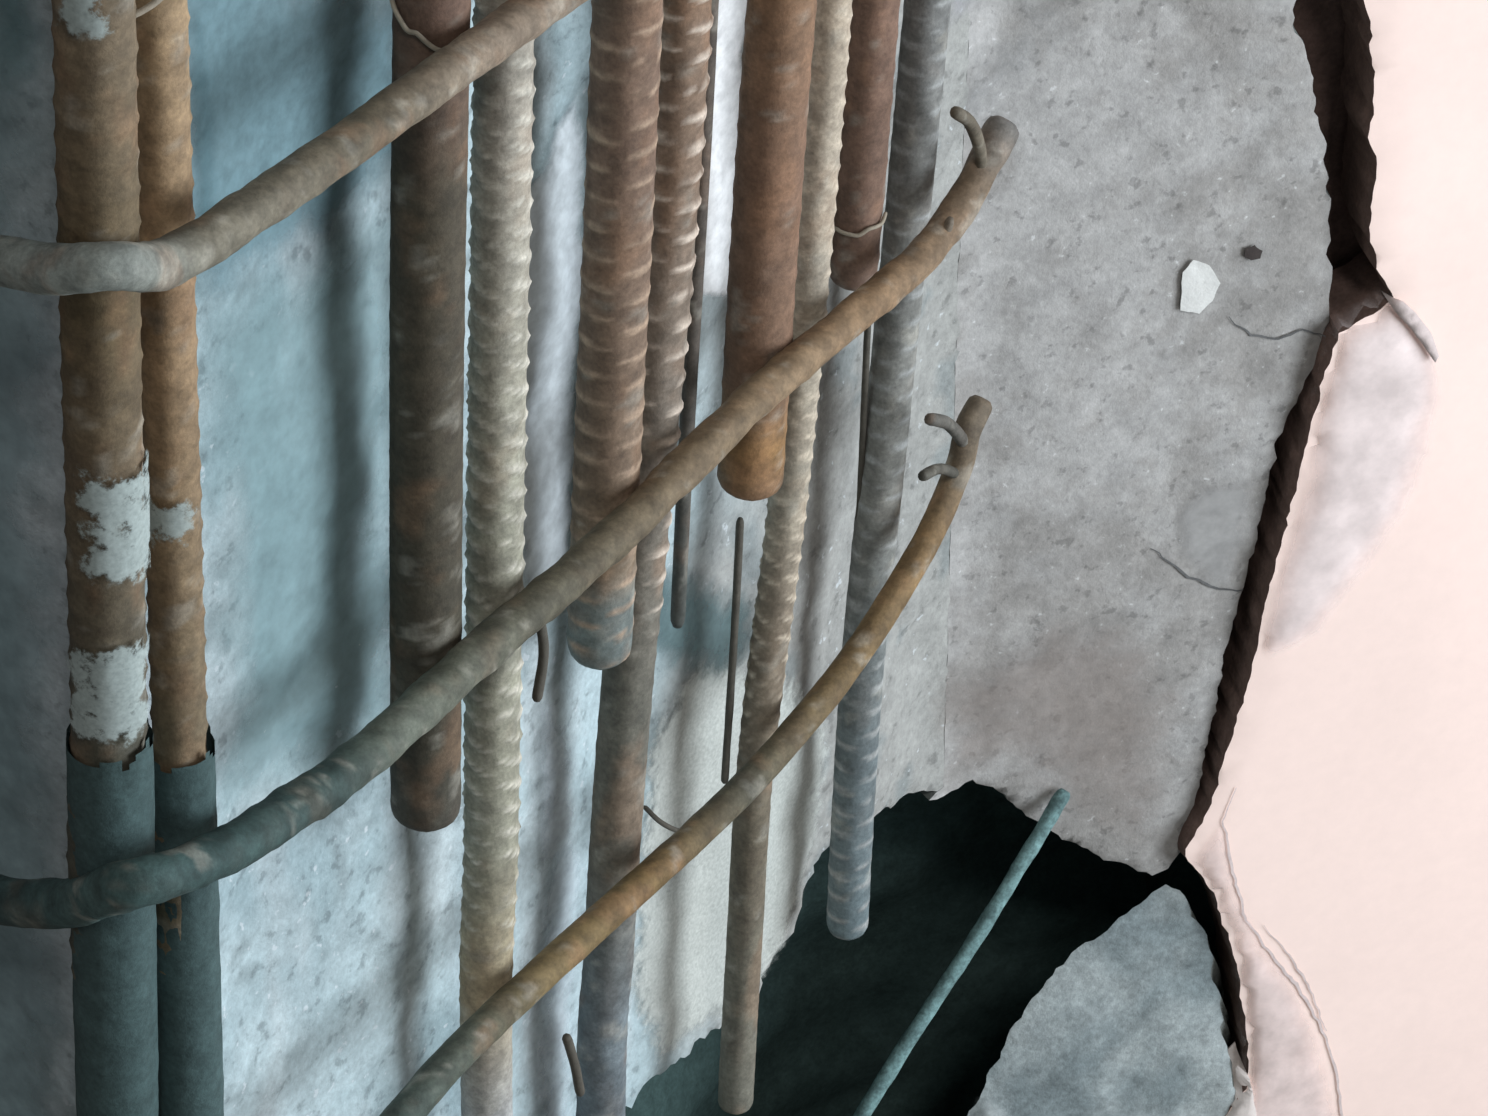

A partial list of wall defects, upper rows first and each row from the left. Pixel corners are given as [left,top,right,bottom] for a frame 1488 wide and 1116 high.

spalling [51,0,196,243]
spalling [58,276,217,879]
spalling [69,880,224,1116]
spalling [392,0,507,83]
spalling [390,645,524,1026]
spalling [389,39,536,704]
spalling [566,492,691,910]
spalling [570,0,719,548]
spalling [717,368,822,773]
spalling [721,0,952,405]
spalling [576,636,1148,1116]
spalling [842,281,924,648]